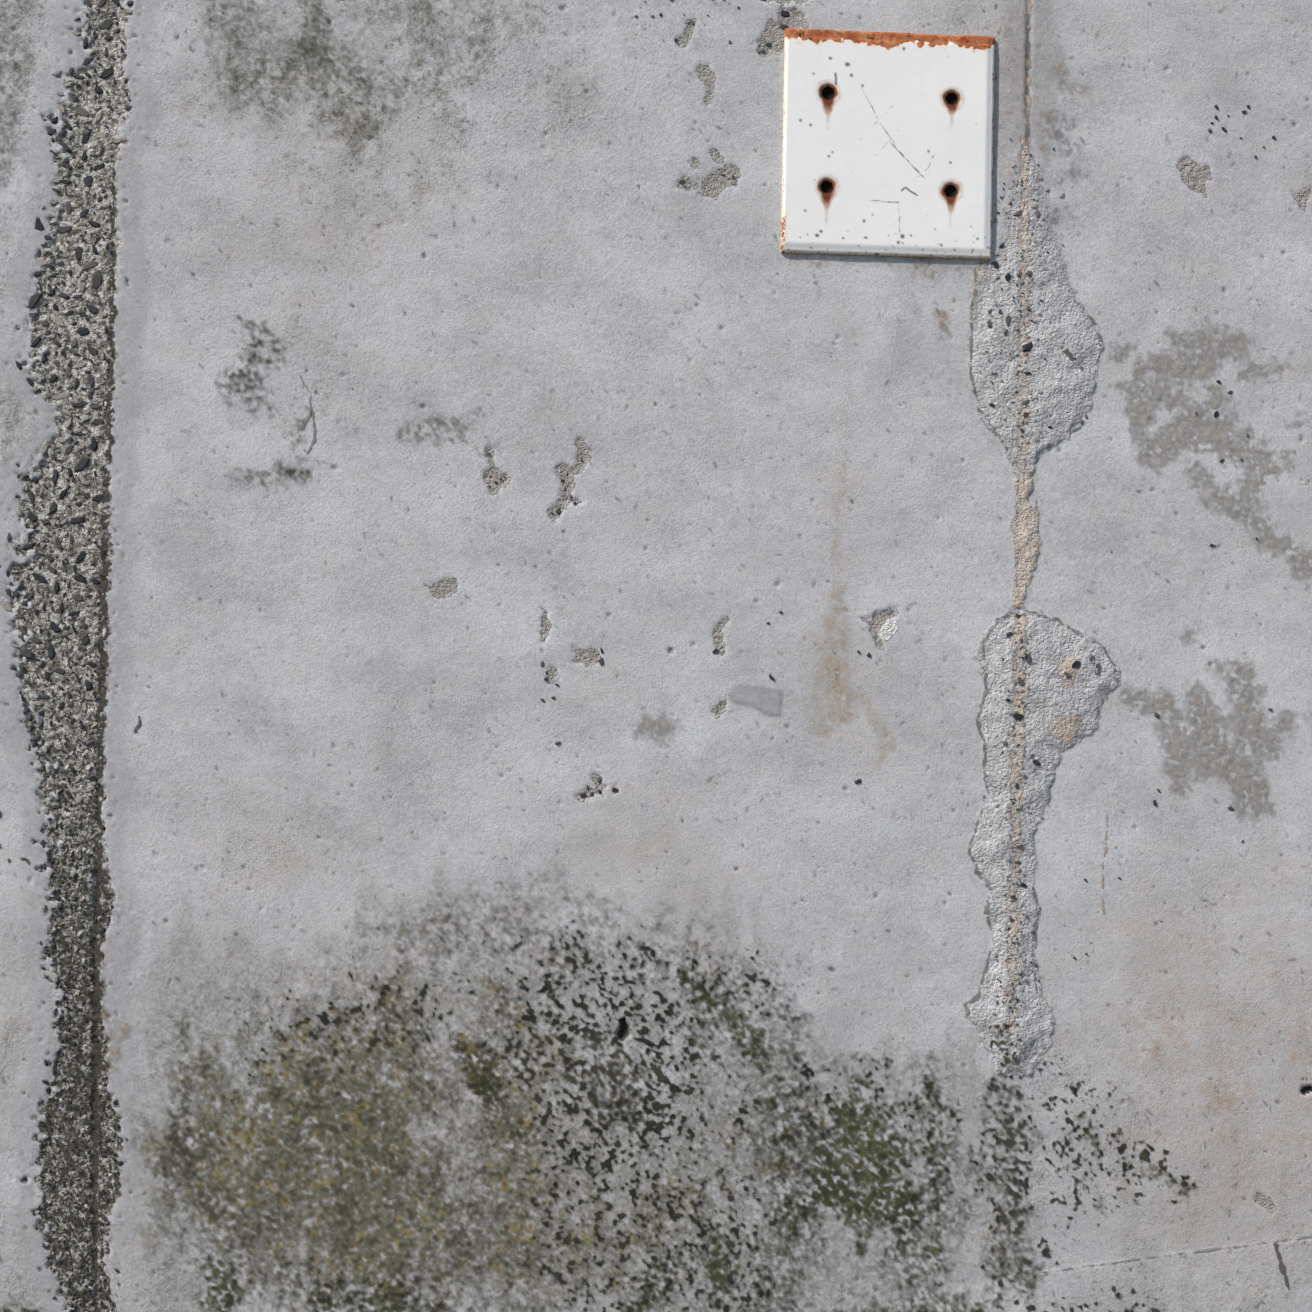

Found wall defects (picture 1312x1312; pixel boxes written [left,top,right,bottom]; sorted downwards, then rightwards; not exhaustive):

spalling [674,14,708,47]
spalling [755,0,809,57]
rust [819,83,838,112]
rust [943,90,961,113]
crack [1023,0,1032,144]
rust [818,178,836,205]
rust [941,182,959,208]
spalling [1118,332,1312,578]
spalling [0,0,142,1312]
spalling [1124,662,1292,817]
damp [482,920,720,1249]
damp [962,1014,1196,1312]